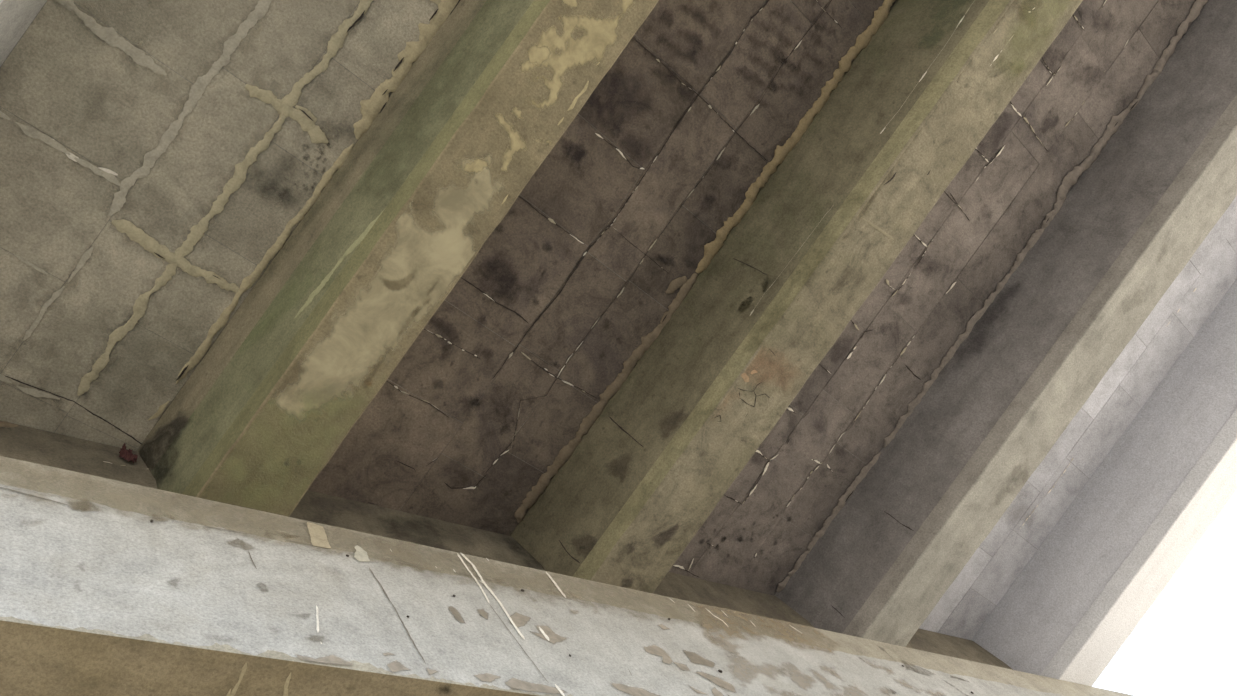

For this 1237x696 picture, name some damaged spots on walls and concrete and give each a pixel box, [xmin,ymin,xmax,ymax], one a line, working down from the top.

crack [380,57,404,113]
peeling [464,0,634,172]
crack [1010,101,1085,151]
crack [927,145,1005,221]
damp [276,155,503,420]
crack [398,0,841,504]
damp [739,214,826,315]
crack [819,320,872,374]
crack [5,376,142,444]
crack [785,333,921,509]
spalling [612,683,659,696]
peeling [644,638,864,696]